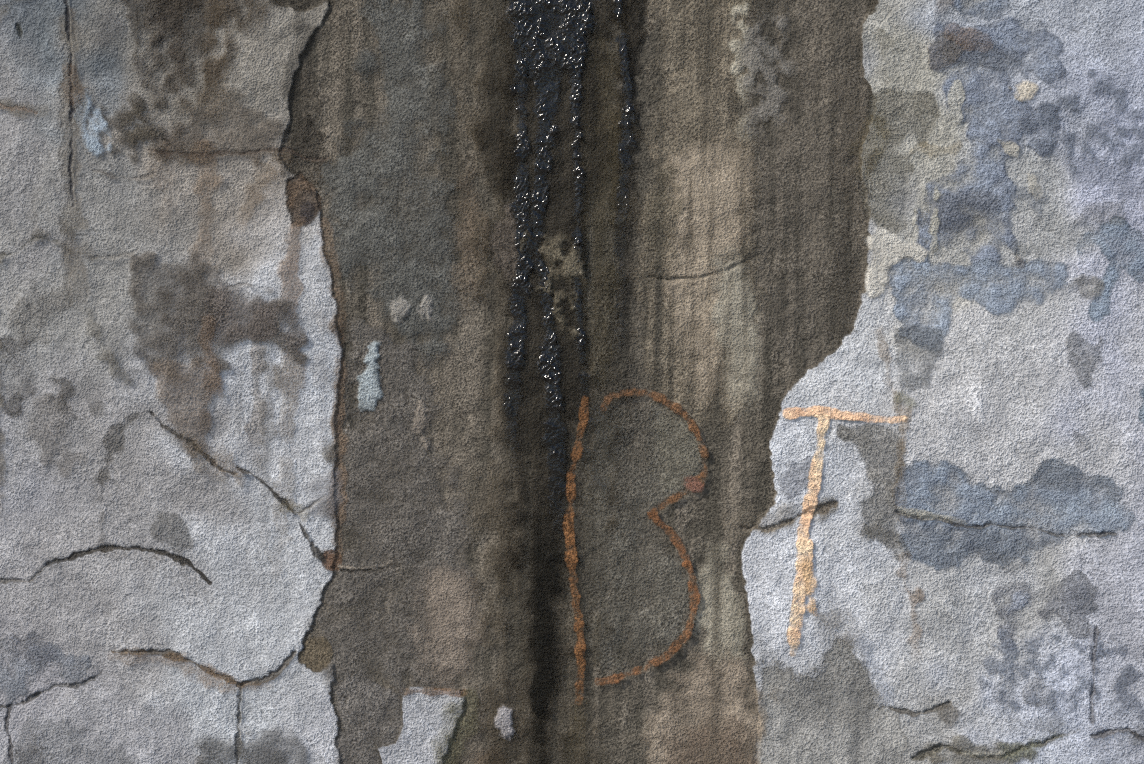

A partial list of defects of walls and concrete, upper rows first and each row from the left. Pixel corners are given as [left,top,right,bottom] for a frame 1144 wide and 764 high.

water stain [124,0,197,45]
water stain [211,0,308,43]
water stain [204,42,230,91]
crack [64,0,76,207]
water stain [130,252,307,455]
water stain [316,0,790,764]
crack [100,424,123,479]
crack [149,411,383,574]
crack [0,545,212,585]
crack [0,649,297,764]
water stain [197,732,306,764]